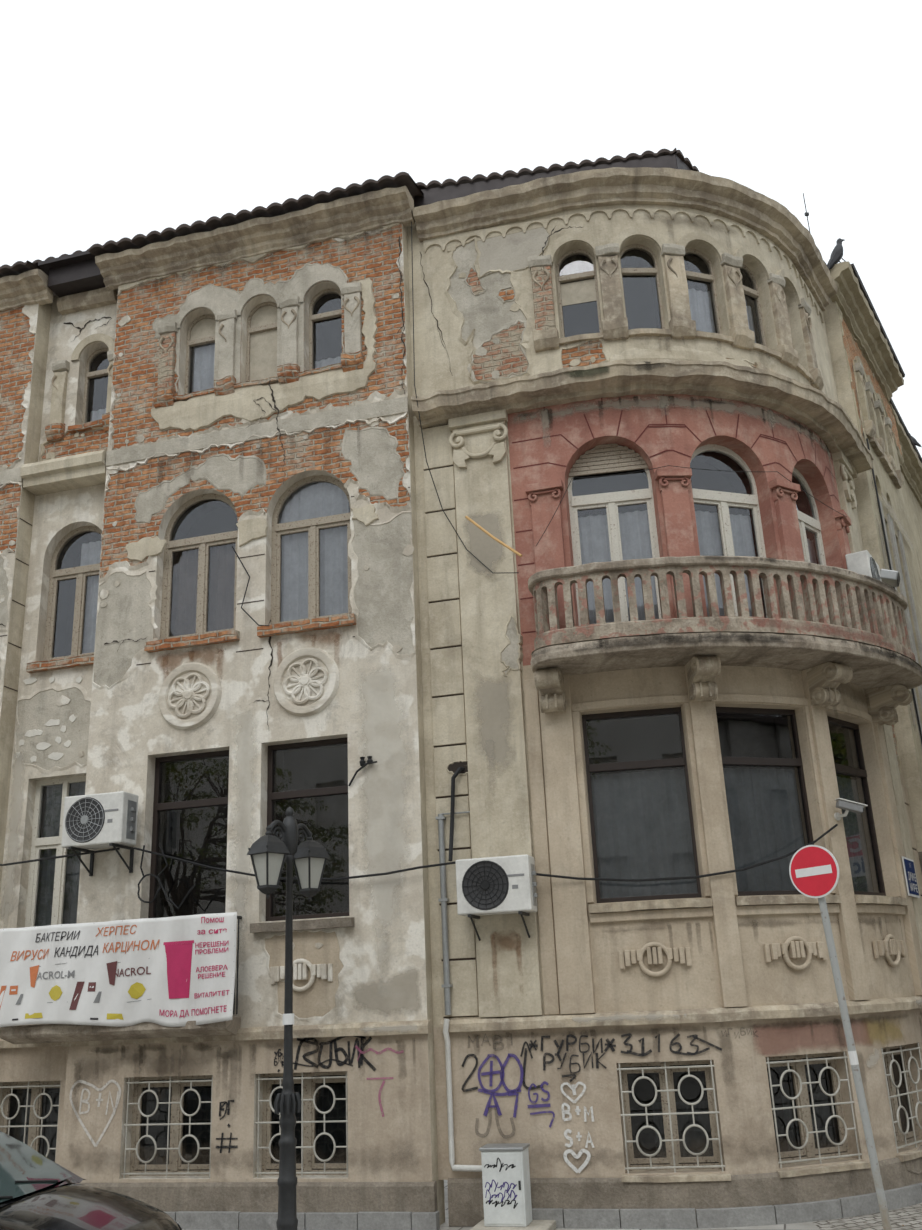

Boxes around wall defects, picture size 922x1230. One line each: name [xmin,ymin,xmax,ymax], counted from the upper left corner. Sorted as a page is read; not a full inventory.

crack [396,235,453,394]
flaking render [444,226,550,385]
flaking render [0,223,415,775]
crack [254,620,273,727]